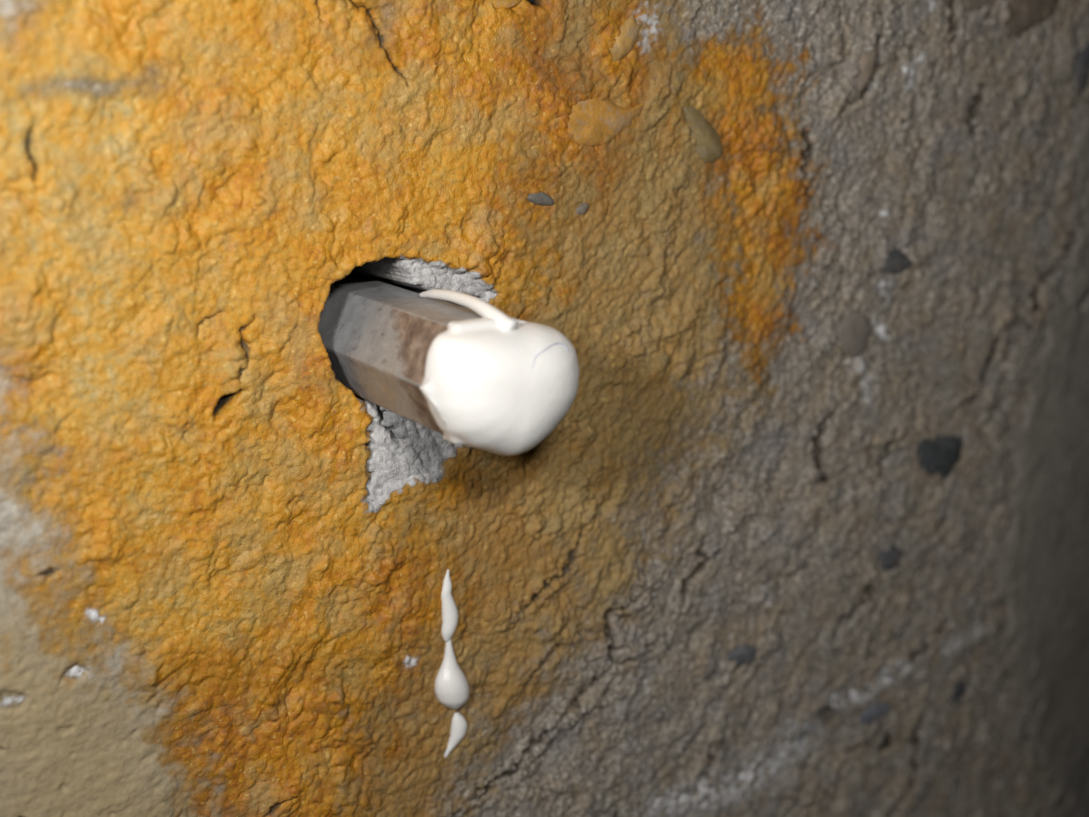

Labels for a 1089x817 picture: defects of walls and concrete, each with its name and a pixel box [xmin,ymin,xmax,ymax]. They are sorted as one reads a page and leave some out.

crack [350,0,402,75]
spalling [31,69,157,97]
spalling [377,255,498,303]
rust [0,0,824,817]
spalling [426,0,1089,817]
spalling [354,394,469,513]
water stain [441,569,458,641]